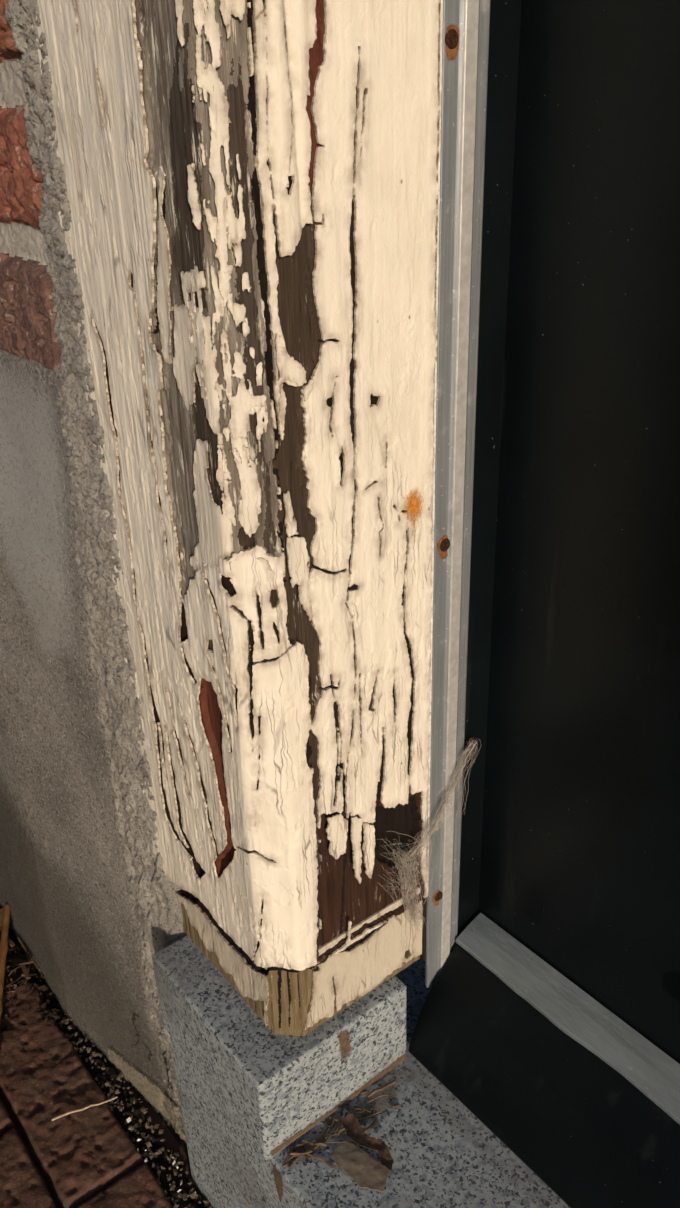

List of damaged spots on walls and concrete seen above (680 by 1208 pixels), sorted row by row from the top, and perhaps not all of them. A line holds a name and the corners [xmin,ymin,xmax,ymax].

crack [133,0,414,934]
peeling [134,0,425,1037]
corrosion [406,491,422,521]
corrosion [446,25,459,60]